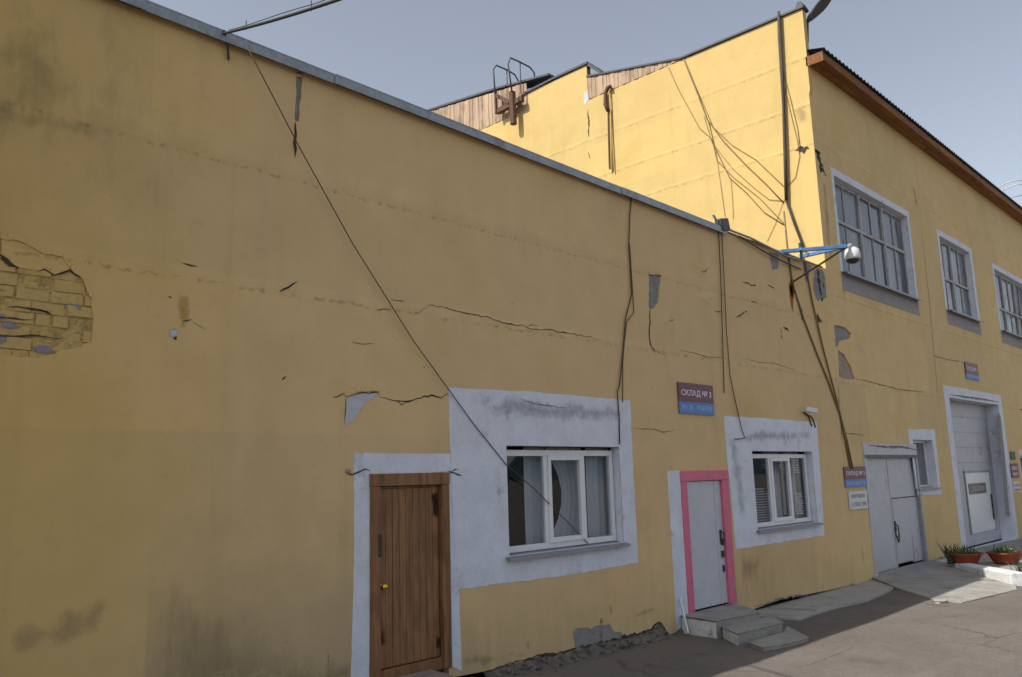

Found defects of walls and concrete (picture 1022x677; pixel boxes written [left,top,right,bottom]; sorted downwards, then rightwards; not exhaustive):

flaking render [0,231,93,358]
crack [379,299,598,340]
flaking render [648,272,661,353]
flaking render [834,323,854,379]
flaking render [336,387,380,424]
flaking render [483,620,684,677]